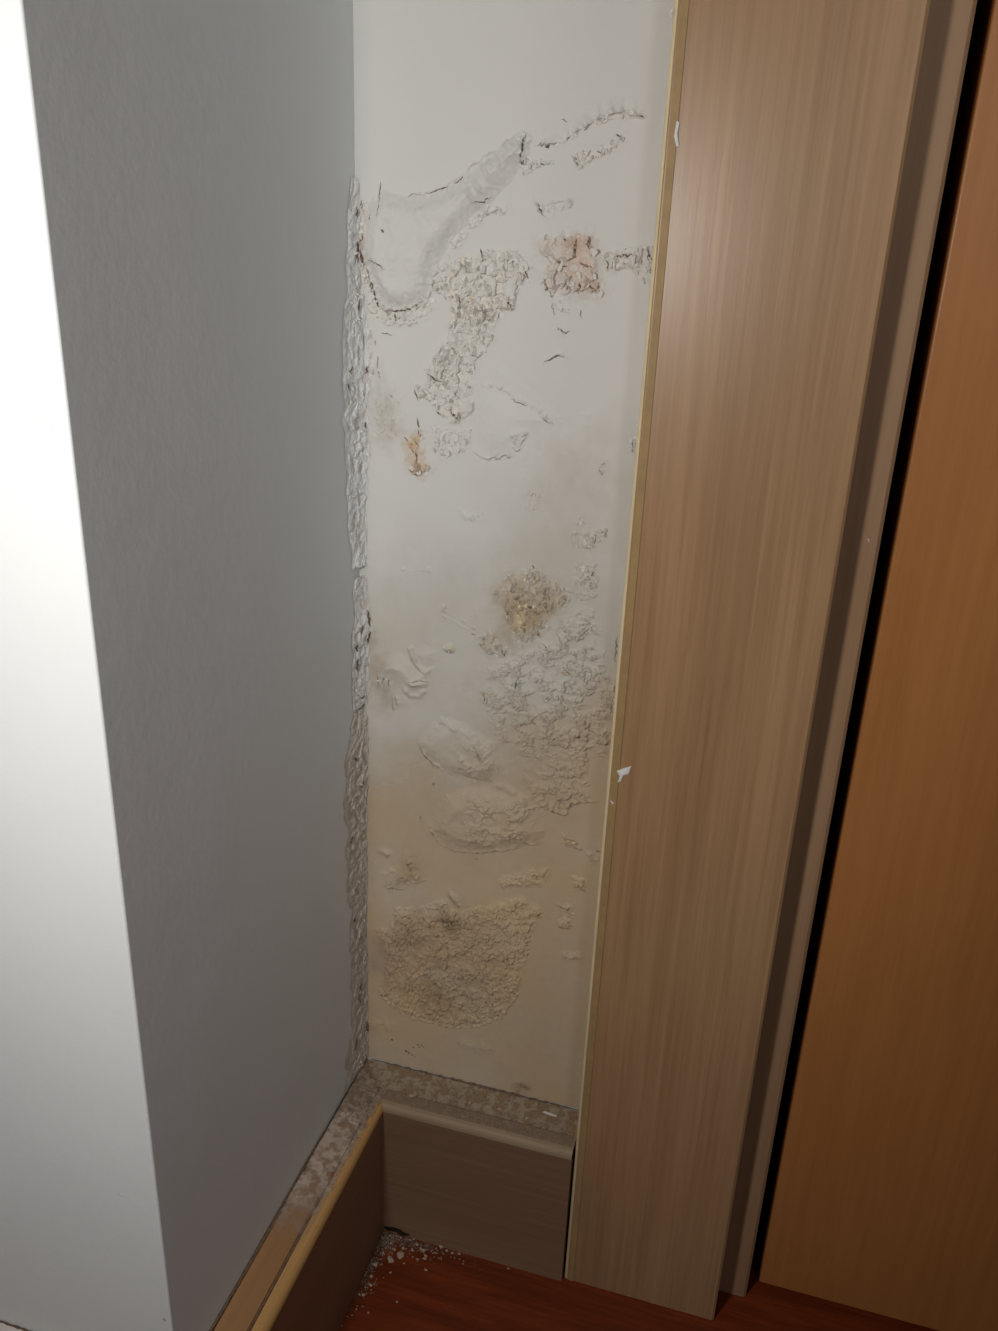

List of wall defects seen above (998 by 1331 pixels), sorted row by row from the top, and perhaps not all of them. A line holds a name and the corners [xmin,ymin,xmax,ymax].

peeling [518,96,659,181]
peeling [404,231,654,479]
flaking render [489,559,578,652]
water stain [367,716,613,1108]